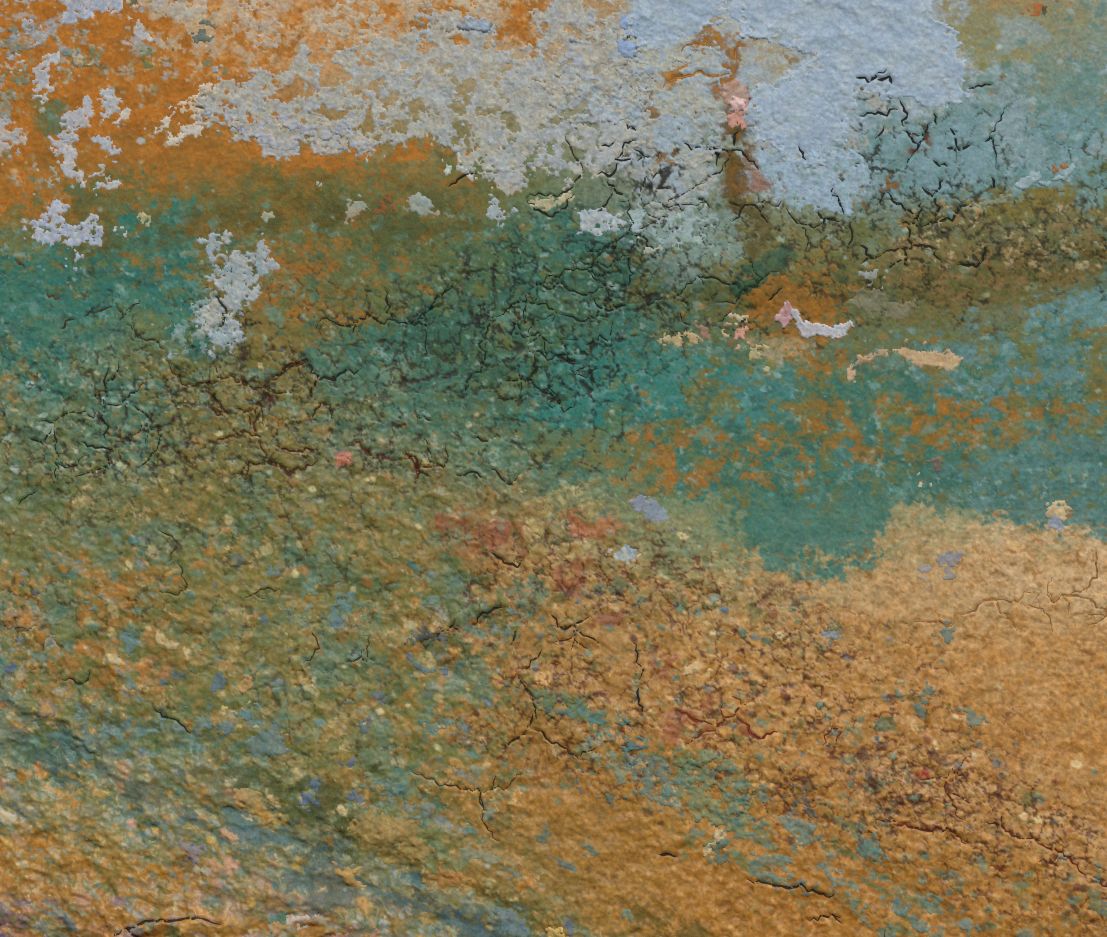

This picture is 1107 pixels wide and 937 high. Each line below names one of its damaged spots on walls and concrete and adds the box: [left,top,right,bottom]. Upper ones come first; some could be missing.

peeling [0,0,971,271]
peeling [964,162,1076,215]
crack [0,362,162,504]
crack [46,292,361,483]
peeling [164,211,280,360]
crack [348,416,518,485]
peeling [774,300,855,340]
peeling [847,269,920,322]
peeling [847,339,963,383]
crack [502,613,599,758]
crack [678,696,778,744]
crack [876,757,1107,887]